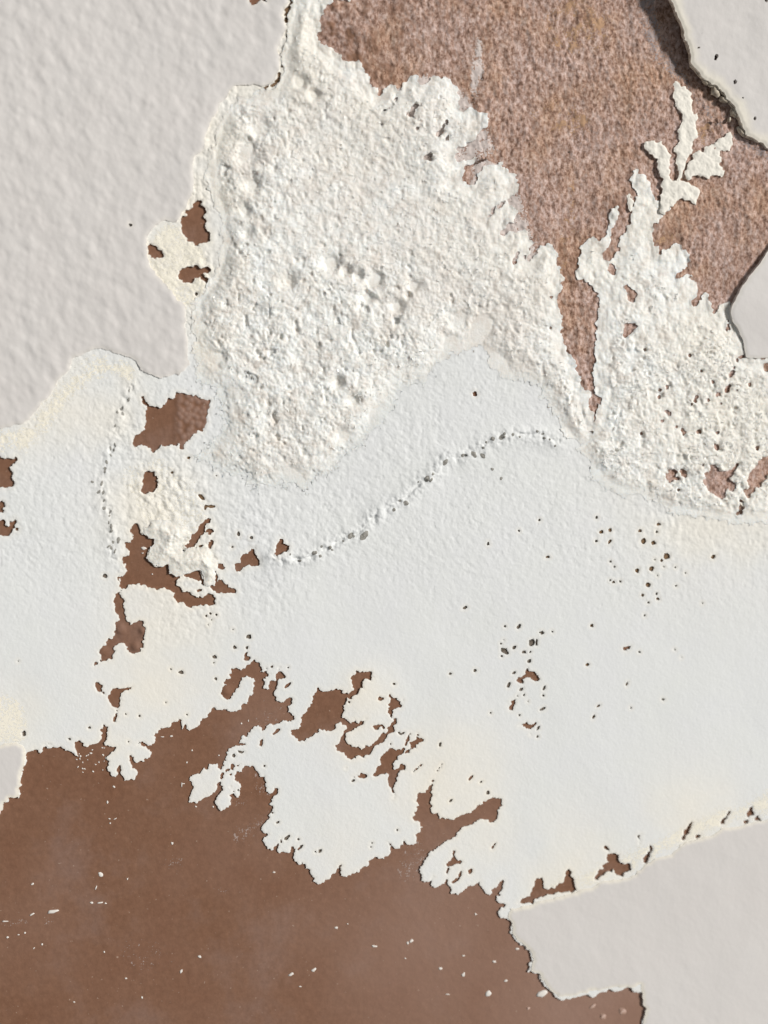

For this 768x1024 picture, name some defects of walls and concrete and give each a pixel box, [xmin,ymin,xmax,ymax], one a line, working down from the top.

peeling [181,200,210,246]
flaking render [317,0,768,421]
peeling [178,265,211,283]
peeling [133,392,211,453]
peeling [141,471,158,494]
flaking render [702,463,738,499]
flaking render [736,456,768,515]
peeling [183,518,211,551]
peeling [117,523,216,608]
peeling [210,571,236,593]
peeling [99,592,146,662]
peeling [0,660,646,1024]